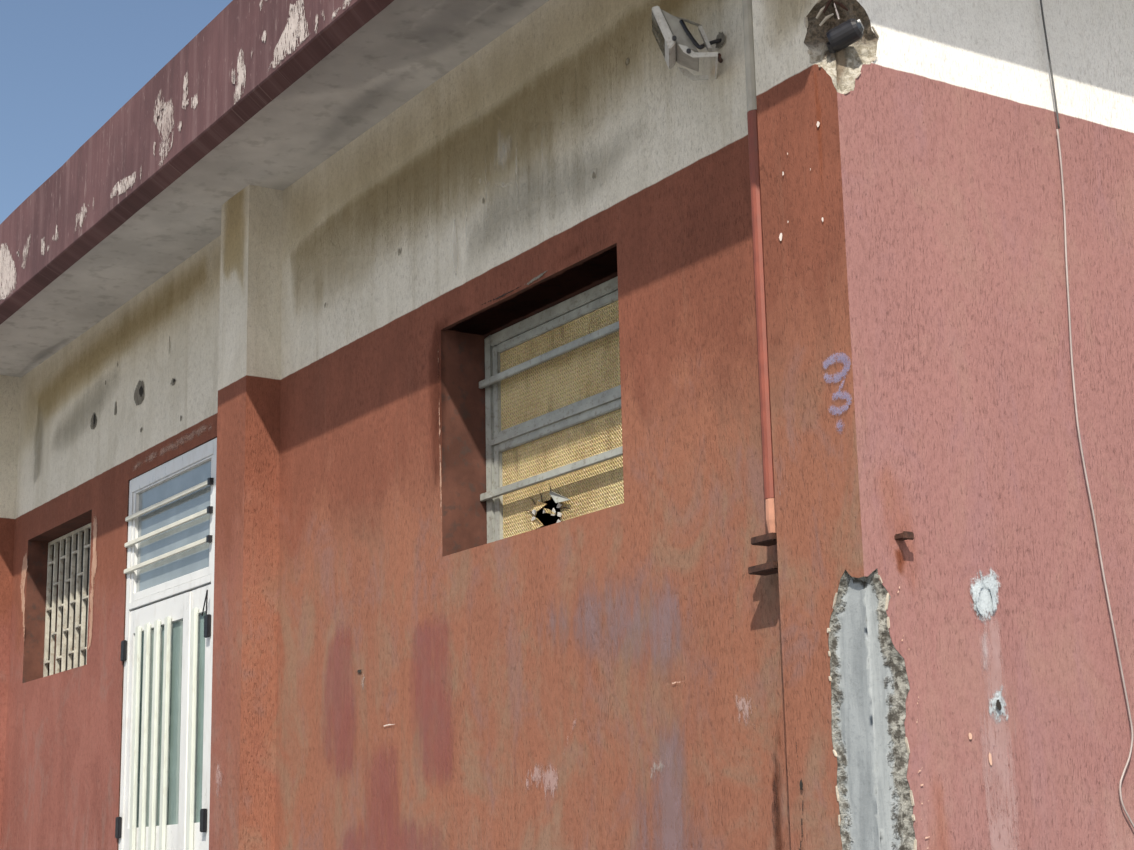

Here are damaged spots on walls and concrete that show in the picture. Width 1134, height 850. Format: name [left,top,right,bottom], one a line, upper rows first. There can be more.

peeling [231,49,252,104]
peeling [262,0,351,70]
spalling [804,0,879,94]
peeling [153,71,198,166]
peeling [75,197,94,231]
peeling [113,167,142,196]
peeling [0,225,58,299]
spalling [134,380,144,405]
spalling [827,569,917,850]